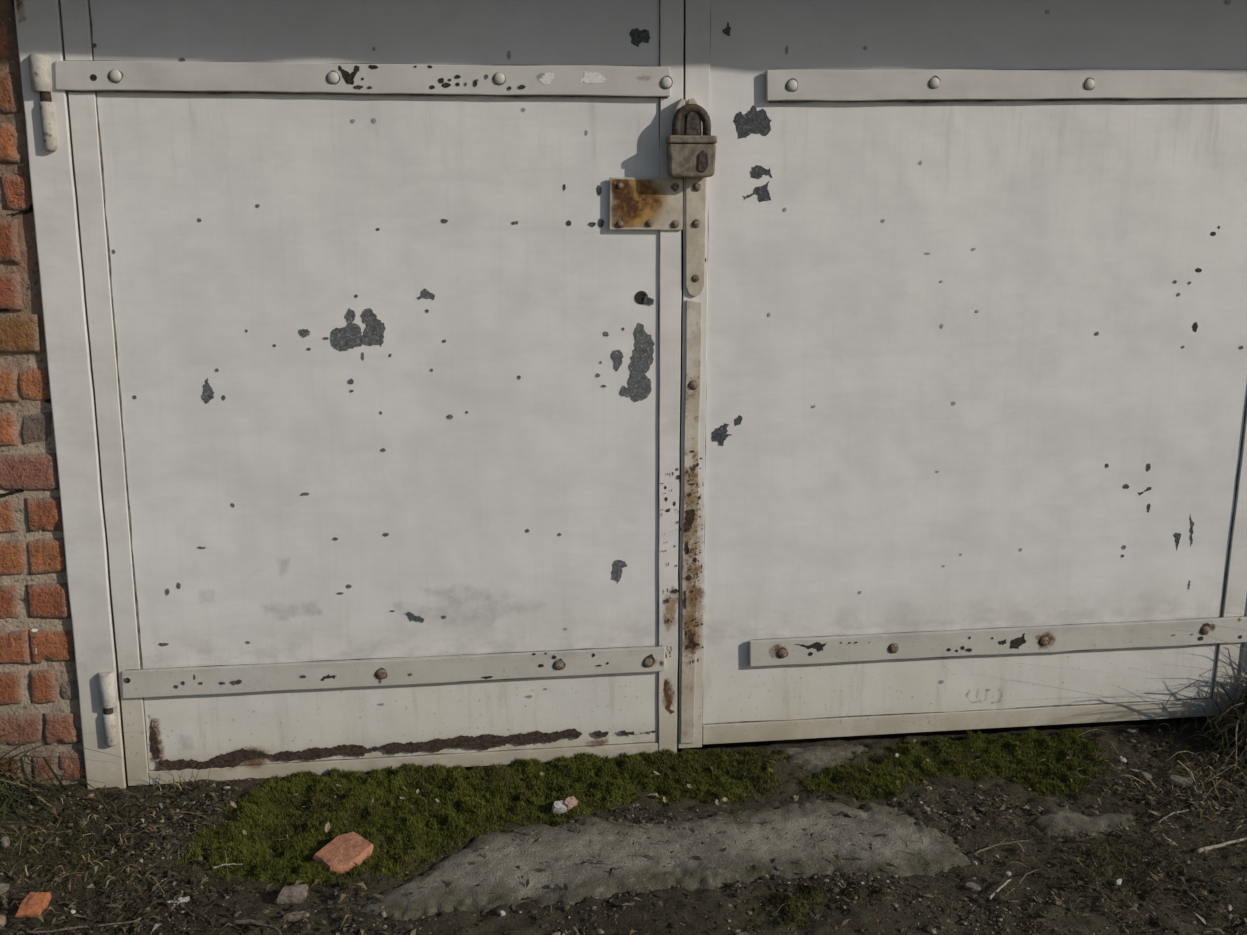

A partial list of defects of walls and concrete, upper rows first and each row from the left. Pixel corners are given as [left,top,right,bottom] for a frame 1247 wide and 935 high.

peeling [338,65,379,90]
peeling [414,65,488,89]
peeling [733,105,772,139]
peeling [743,165,772,202]
corrosion [611,179,664,227]
peeling [298,294,391,360]
peeling [595,323,655,402]
peeling [711,415,742,446]
corrosion [643,450,704,714]
peeling [992,633,1026,649]
corrosion [149,720,656,771]